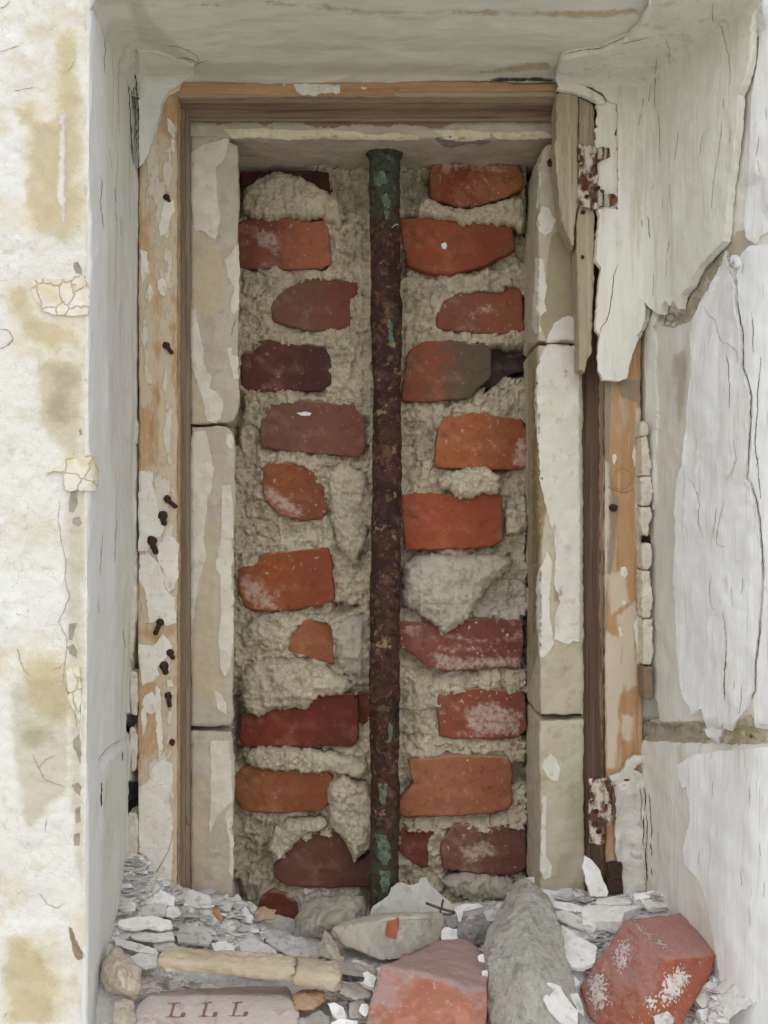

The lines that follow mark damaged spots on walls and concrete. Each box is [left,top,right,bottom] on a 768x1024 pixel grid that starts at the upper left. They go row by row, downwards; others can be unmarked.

leakage [57,116,66,222]
peeling [191,128,420,240]
peeling [283,83,340,97]
peeling [536,161,556,236]
crack [562,36,730,206]
peeling [31,262,90,317]
peeling [224,243,240,314]
peeling [227,347,240,379]
peeling [531,257,581,657]
peeling [542,0,768,1024]
peeling [138,309,234,880]
peeling [527,797,552,882]